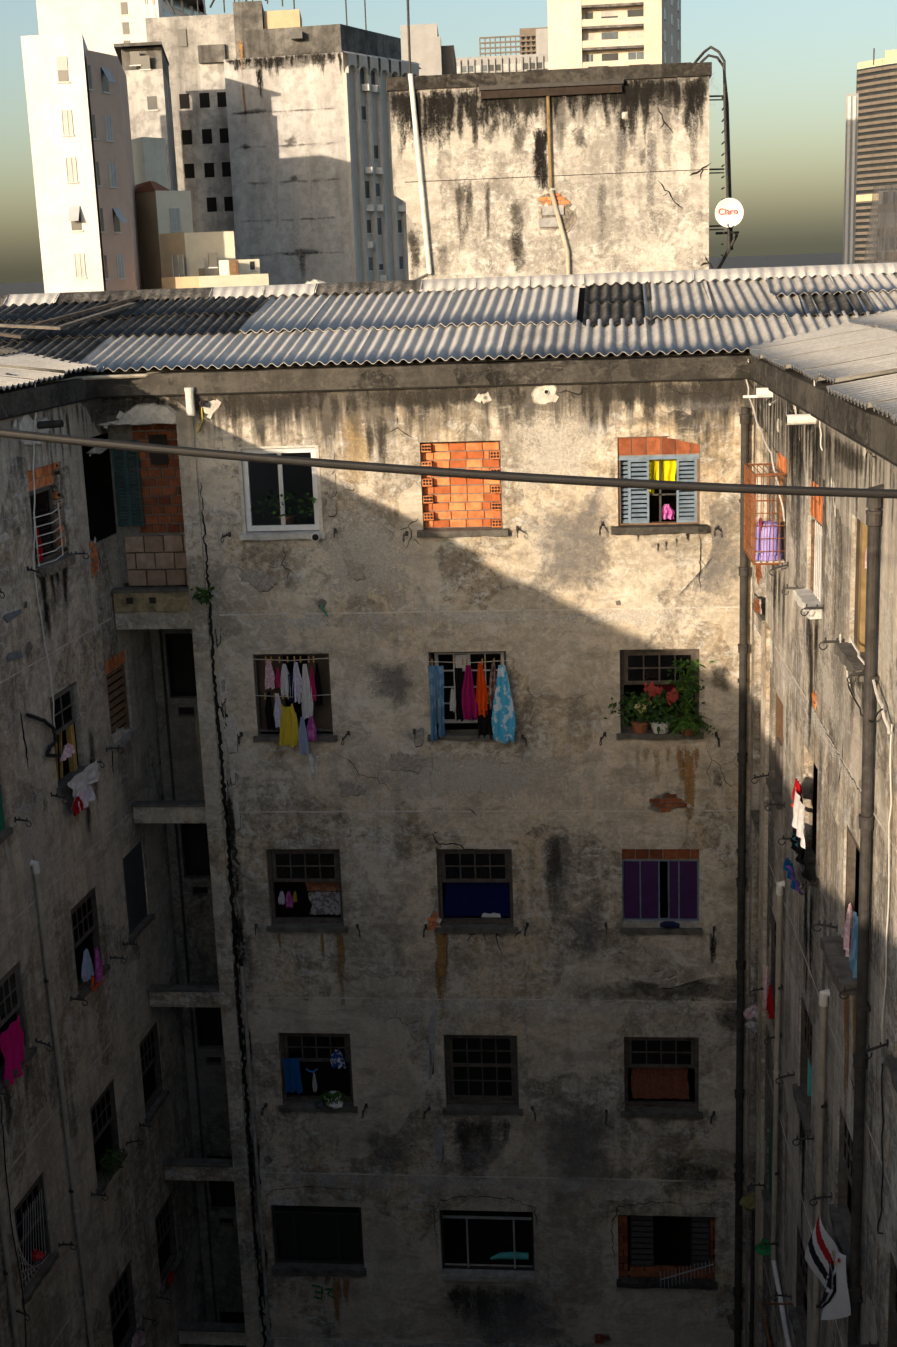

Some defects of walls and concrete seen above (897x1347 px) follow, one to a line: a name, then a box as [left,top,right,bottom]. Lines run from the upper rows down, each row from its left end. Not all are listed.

leakage [390,77,707,188]
leakage [408,235,419,274]
leakage [456,183,489,240]
leakage [510,203,525,271]
spalling [87,403,178,456]
leakage [568,381,895,542]
spalling [648,790,691,812]
rust [677,749,699,820]
crack [200,482,366,1347]
rust [435,933,448,1008]
rust [843,995,856,1106]